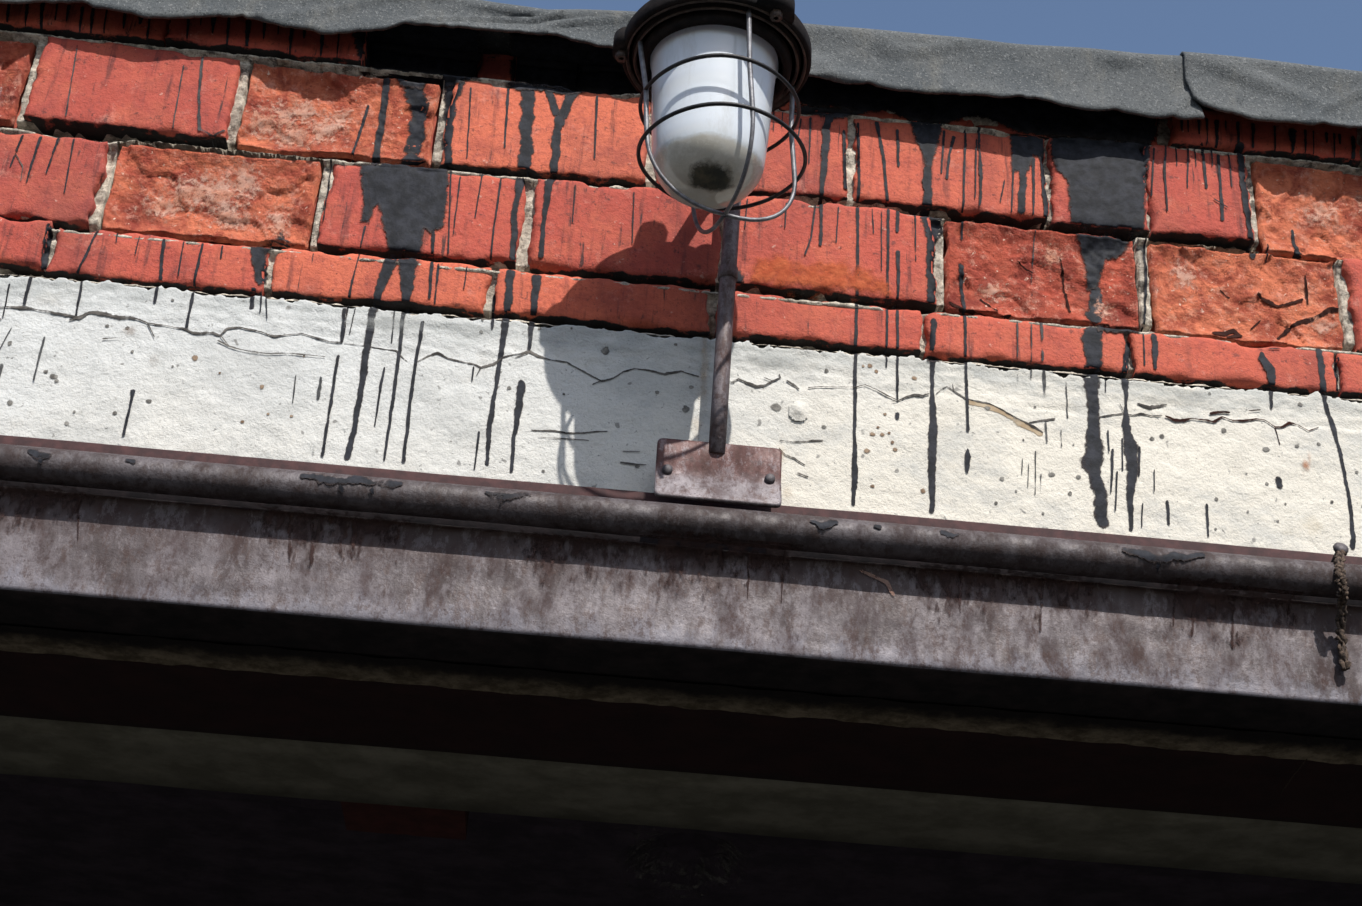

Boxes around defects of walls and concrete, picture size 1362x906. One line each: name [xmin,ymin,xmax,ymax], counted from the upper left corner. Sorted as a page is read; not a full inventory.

crack [0,306,699,385]
water stain [316,78,472,462]
water stain [474,88,578,473]
crack [731,374,1055,436]
water stain [1021,383,1068,495]
water stain [1080,238,1170,530]
crack [1098,403,1319,444]
crack [1220,275,1339,340]
rust [255,503,414,566]
rust [514,530,804,607]
rust [898,564,1107,631]
rust [1161,574,1307,649]